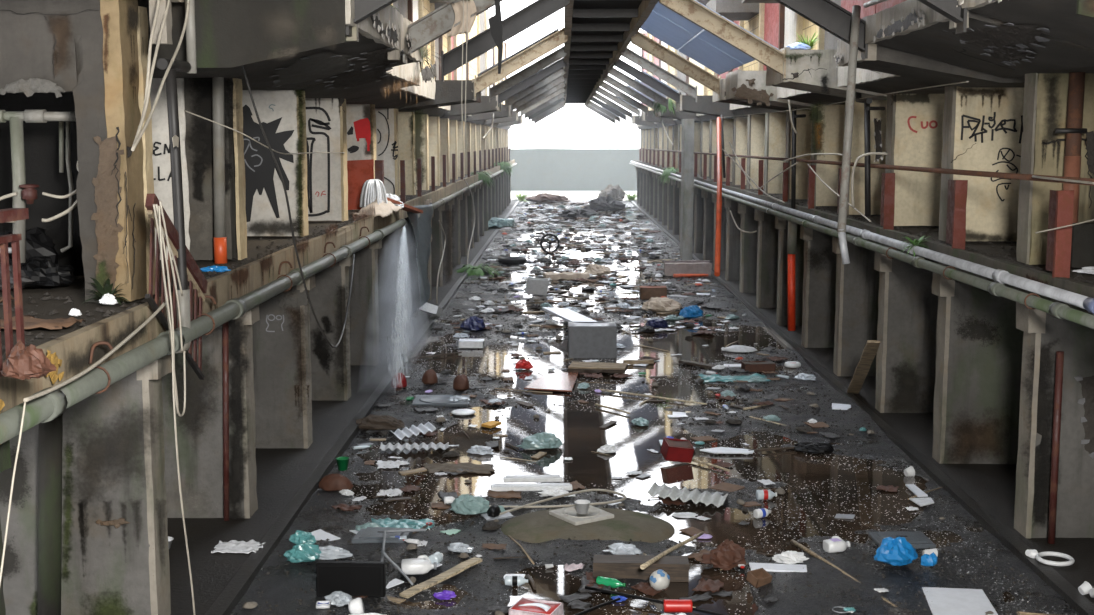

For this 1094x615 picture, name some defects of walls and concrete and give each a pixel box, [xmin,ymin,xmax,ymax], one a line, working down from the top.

water stain [1042,76,1061,168]
spalling [91,136,132,290]
water stain [0,448,29,508]
water stain [3,545,17,576]